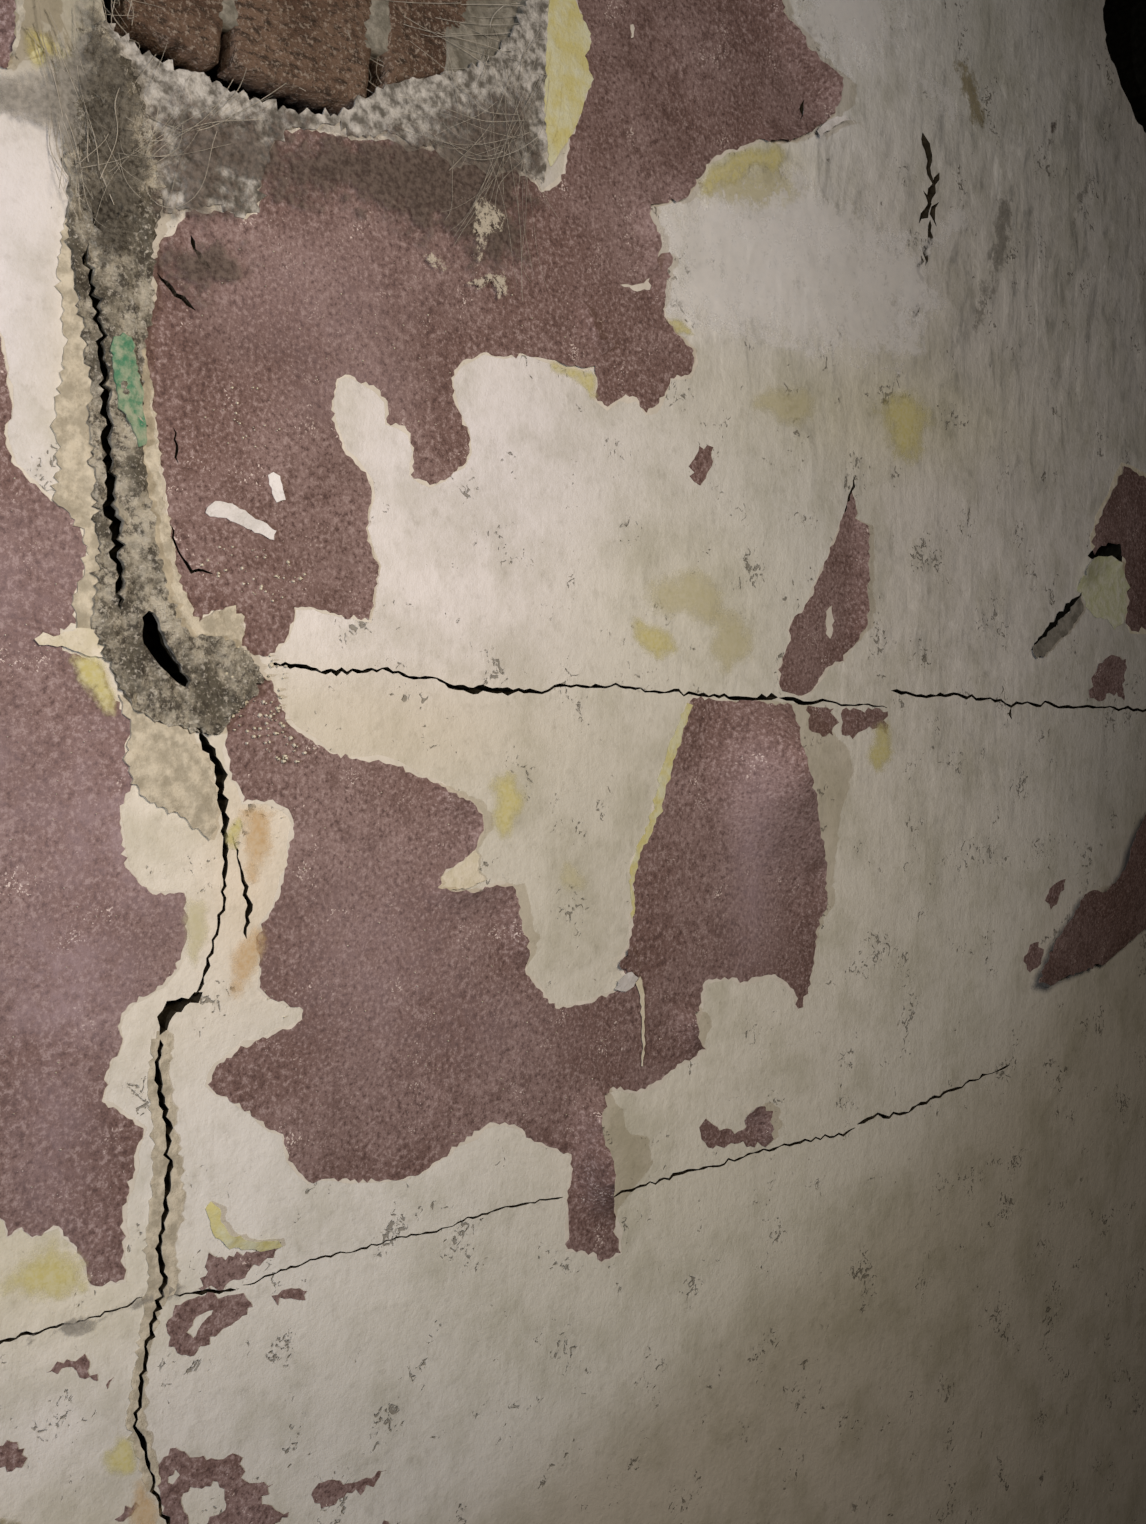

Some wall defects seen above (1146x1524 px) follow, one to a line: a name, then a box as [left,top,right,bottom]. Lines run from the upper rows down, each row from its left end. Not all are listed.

crack [82,192,188,687]
peeling [1031,462,1146,658]
peeling [0,0,870,1492]
crack [273,662,1146,719]
peeling [1039,814,1146,986]
crack [0,728,563,1524]
crack [614,1065,1009,1197]